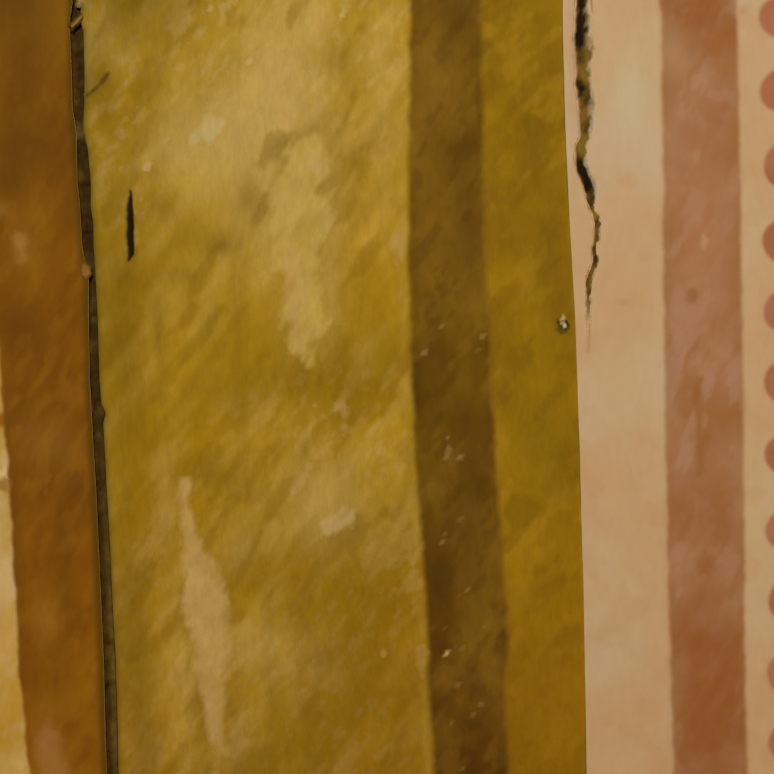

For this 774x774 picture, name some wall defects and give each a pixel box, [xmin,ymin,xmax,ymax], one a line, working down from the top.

crack [69,0,118,774]
crack [572,0,601,354]